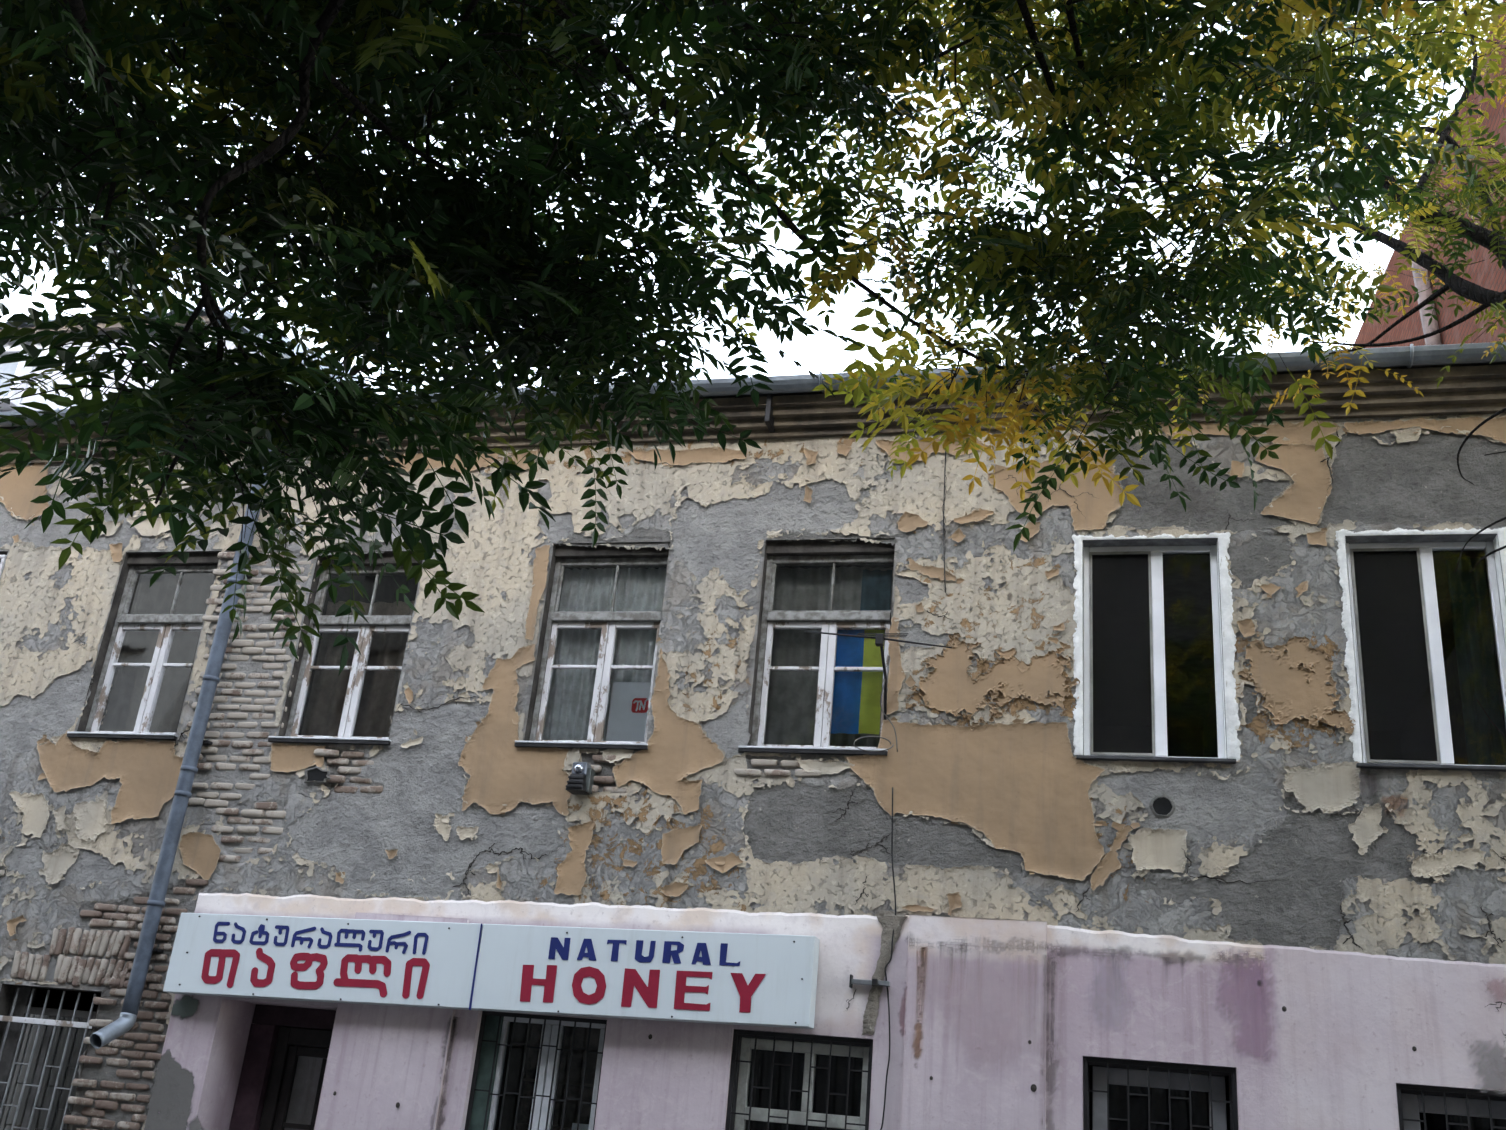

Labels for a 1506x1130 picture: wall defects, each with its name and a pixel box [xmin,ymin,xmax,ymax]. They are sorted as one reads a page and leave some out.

flaking render [0,447,1490,1130]
leakage [1220,953,1270,1056]